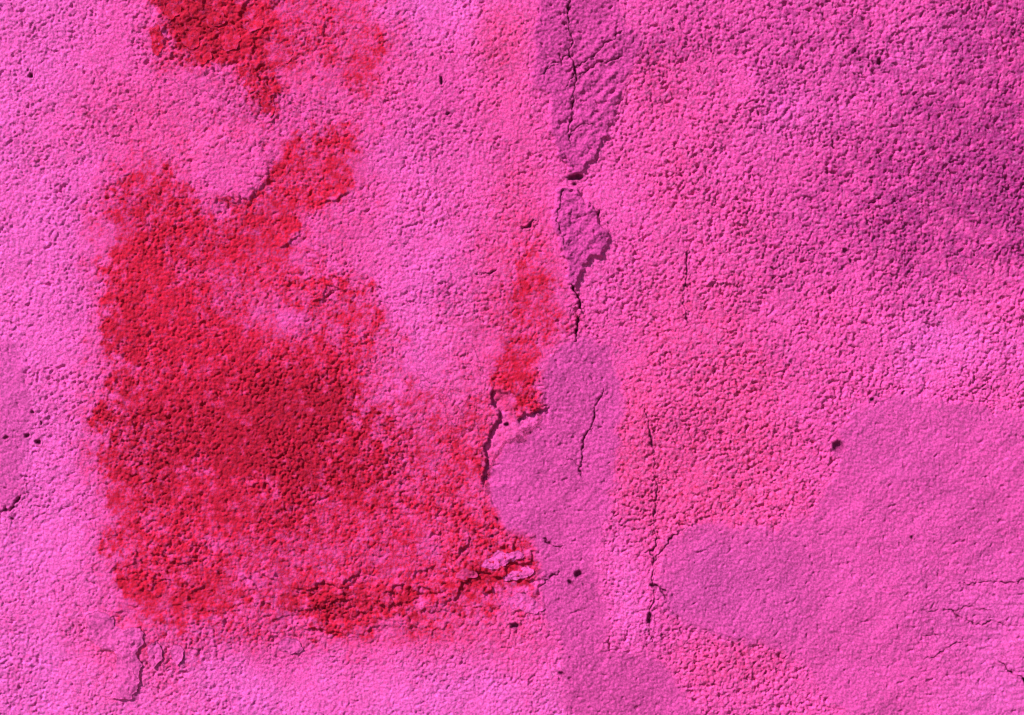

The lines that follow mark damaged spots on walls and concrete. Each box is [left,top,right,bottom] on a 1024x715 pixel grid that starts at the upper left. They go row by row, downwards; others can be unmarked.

crack [541,0,624,145]
water stain [57,0,586,675]
crack [569,282,584,343]
crack [559,388,605,482]
crack [641,403,687,649]